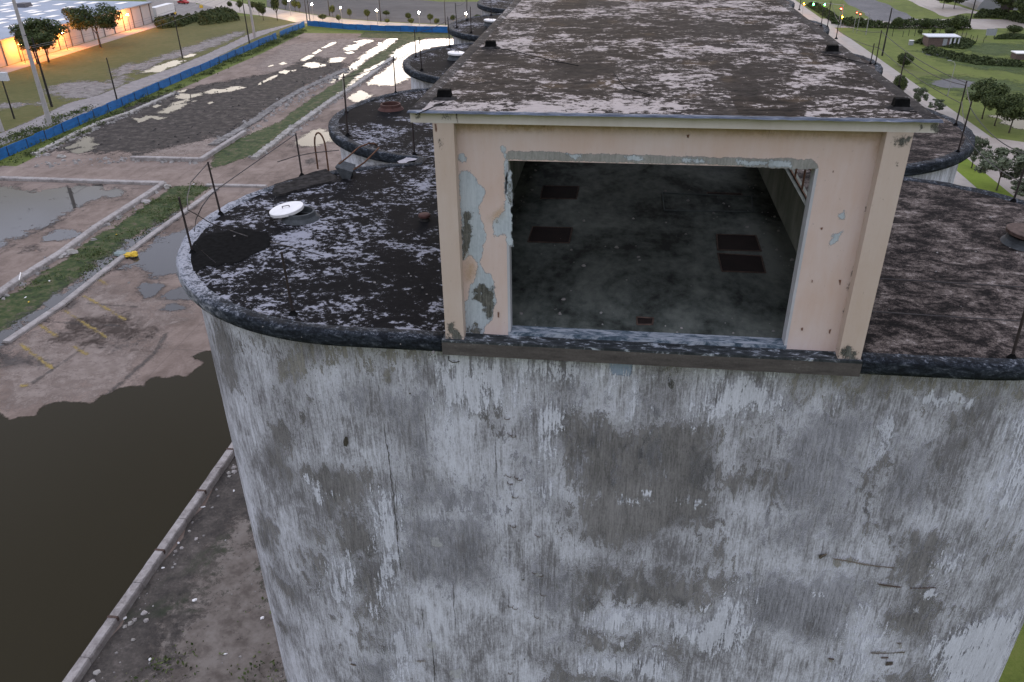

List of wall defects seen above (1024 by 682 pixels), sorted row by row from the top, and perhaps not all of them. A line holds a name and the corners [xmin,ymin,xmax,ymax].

peeling [458,146,818,334]
crack [384,425,401,567]